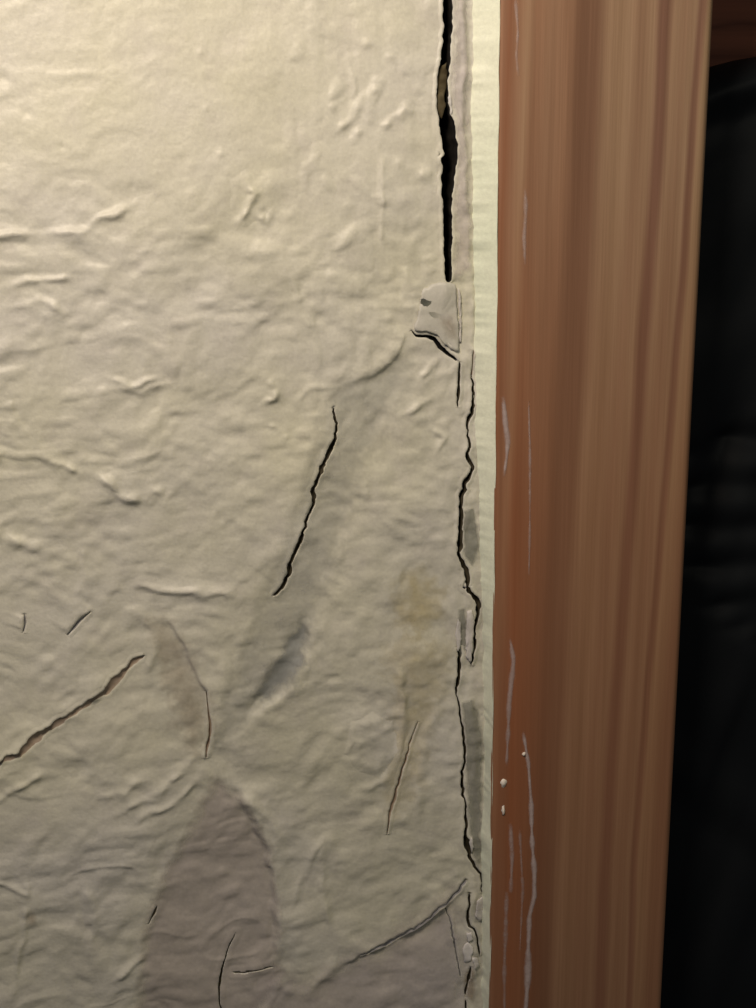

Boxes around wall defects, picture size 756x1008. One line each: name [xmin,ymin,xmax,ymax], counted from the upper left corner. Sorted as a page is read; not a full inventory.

crack [432,0,466,283]
peeling [408,282,462,364]
crack [269,406,342,599]
crack [0,652,147,771]
spalling [260,625,305,697]
crack [358,350,483,1008]
spalling [141,786,279,1008]